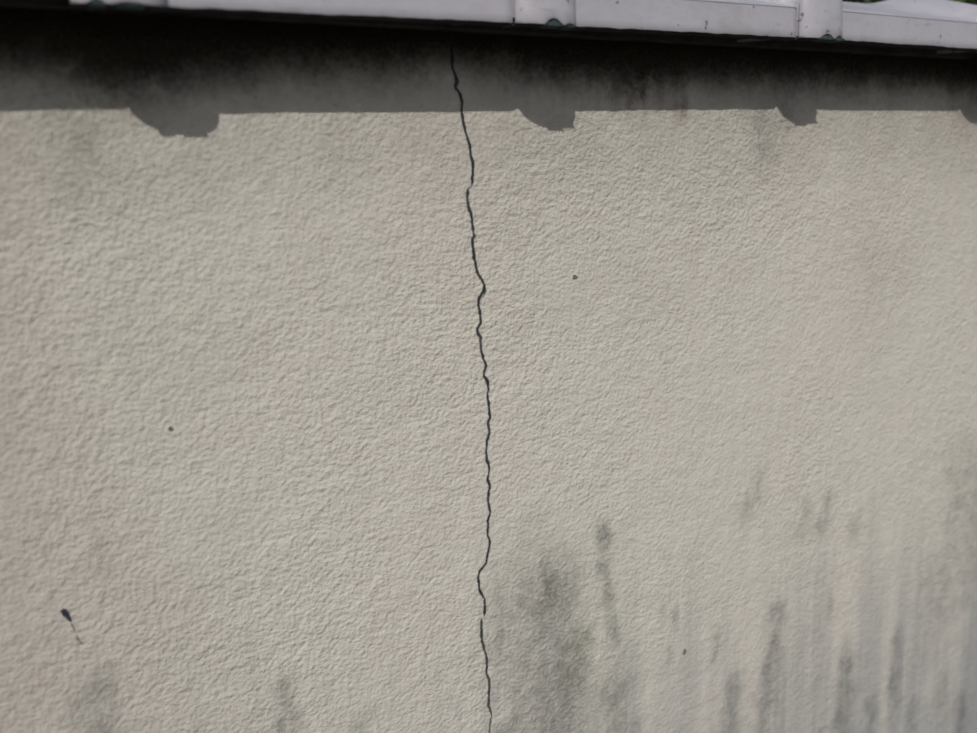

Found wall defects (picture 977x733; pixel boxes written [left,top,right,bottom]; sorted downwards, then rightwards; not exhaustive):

crack [449,31,492,733]